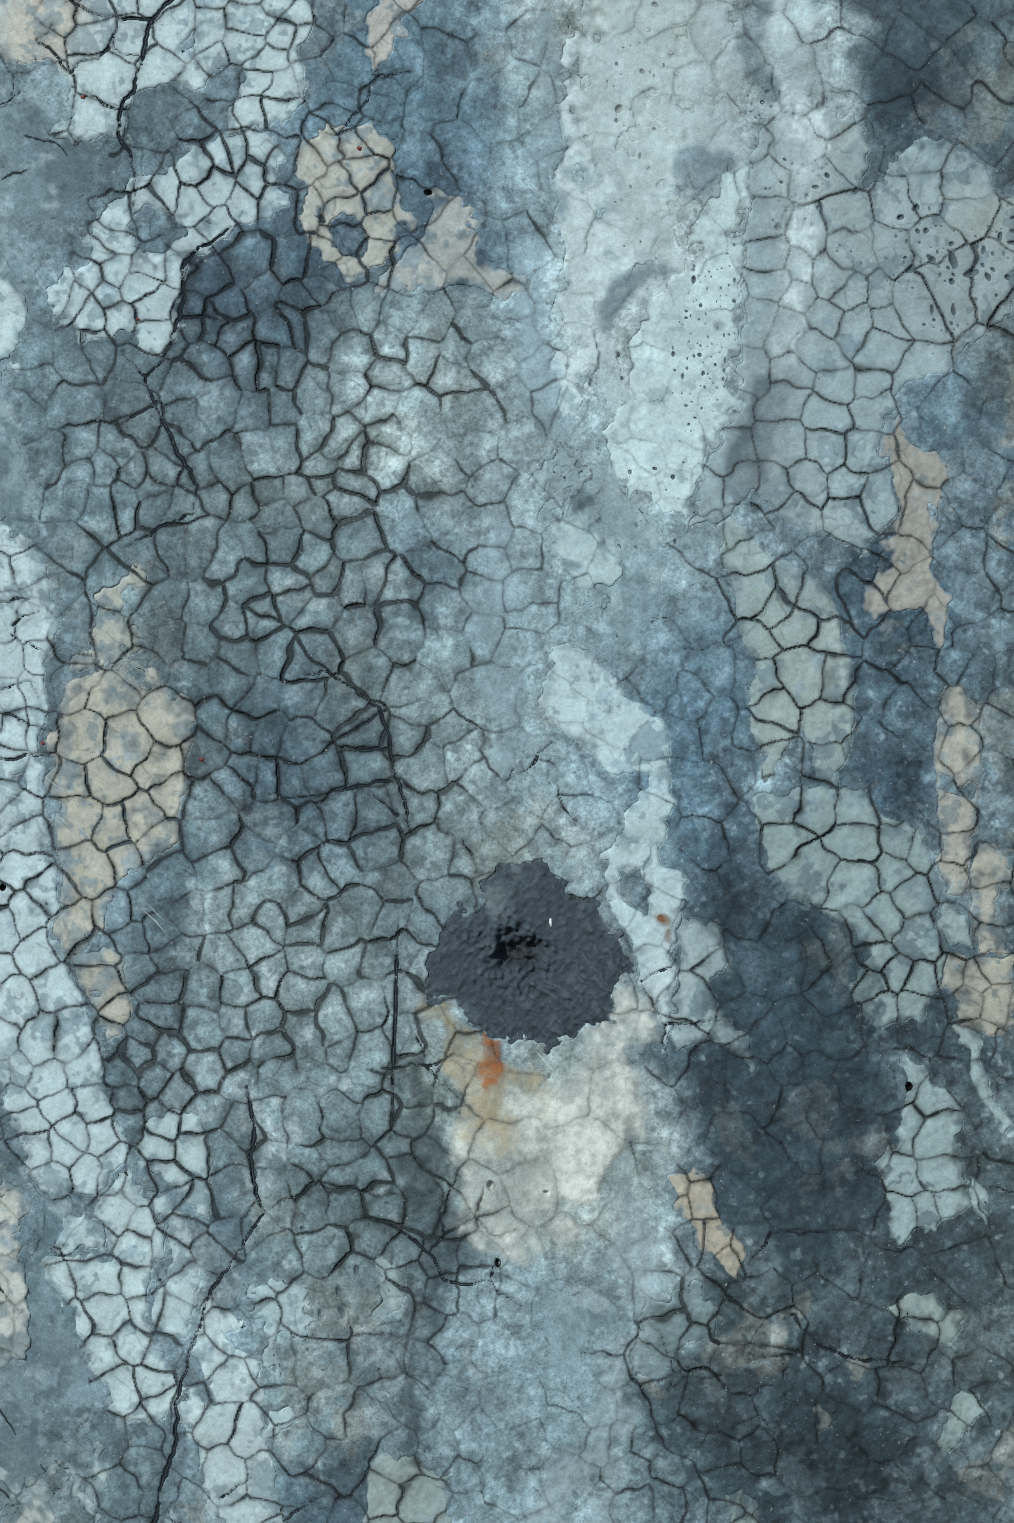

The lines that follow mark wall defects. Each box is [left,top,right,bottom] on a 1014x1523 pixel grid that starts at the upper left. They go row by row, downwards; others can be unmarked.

crack [1,135,67,180]
crack [38,0,174,205]
crack [336,71,411,136]
crack [126,224,239,547]
crack [1,597,52,761]
crack [271,670,412,835]
crack [503,746,577,822]
crack [386,1038,476,1113]
rust [441,1004,540,1141]
crack [641,955,699,1057]
crack [151,1086,521,1523]
crack [647,1312,914,1441]